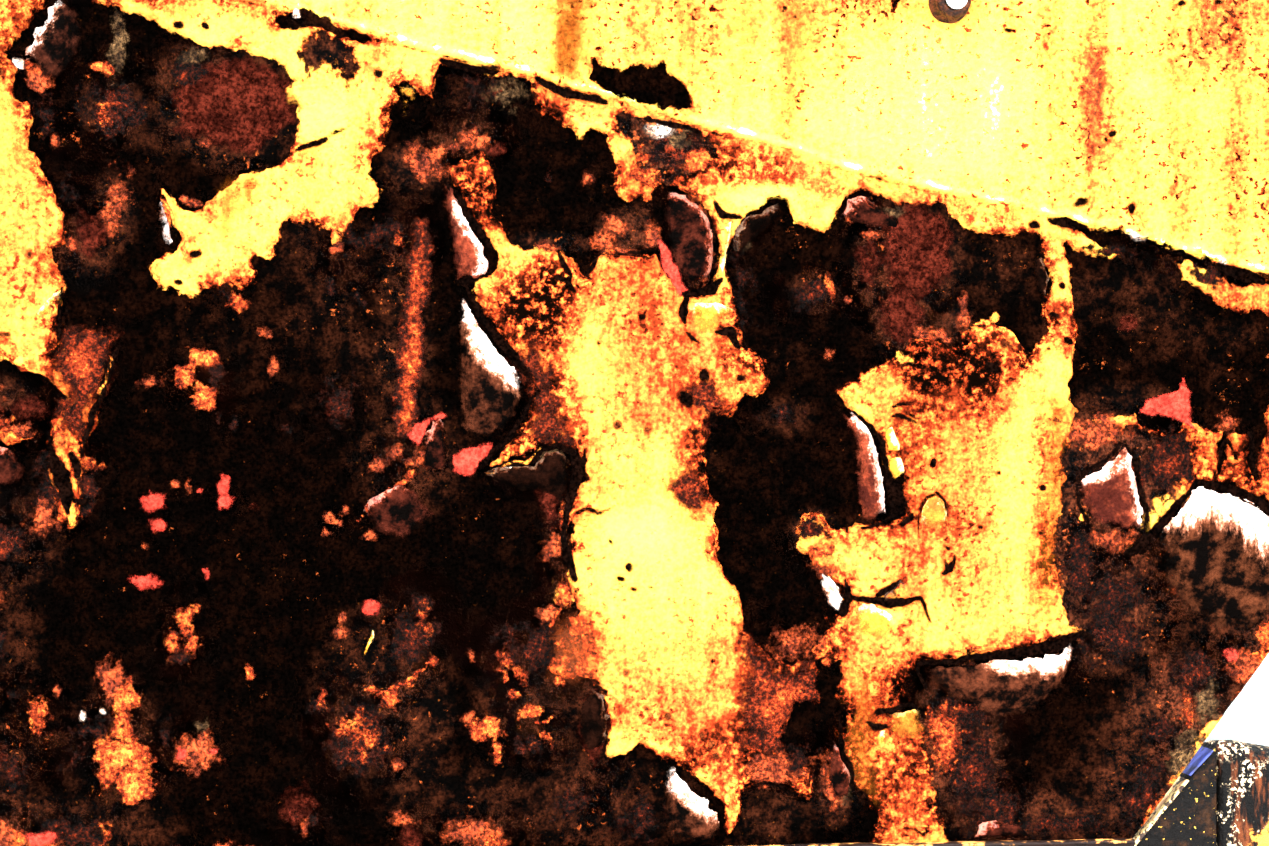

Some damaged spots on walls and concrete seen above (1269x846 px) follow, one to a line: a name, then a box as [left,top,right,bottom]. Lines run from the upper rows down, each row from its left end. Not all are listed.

corrosion [55,326,119,437]
peeling [0,0,879,846]
corrosion [510,339,577,447]
corrosion [667,463,705,519]
corrosion [686,379,724,436]
peeling [703,188,1054,665]
peeling [889,226,1269,842]
corrosion [732,623,820,756]